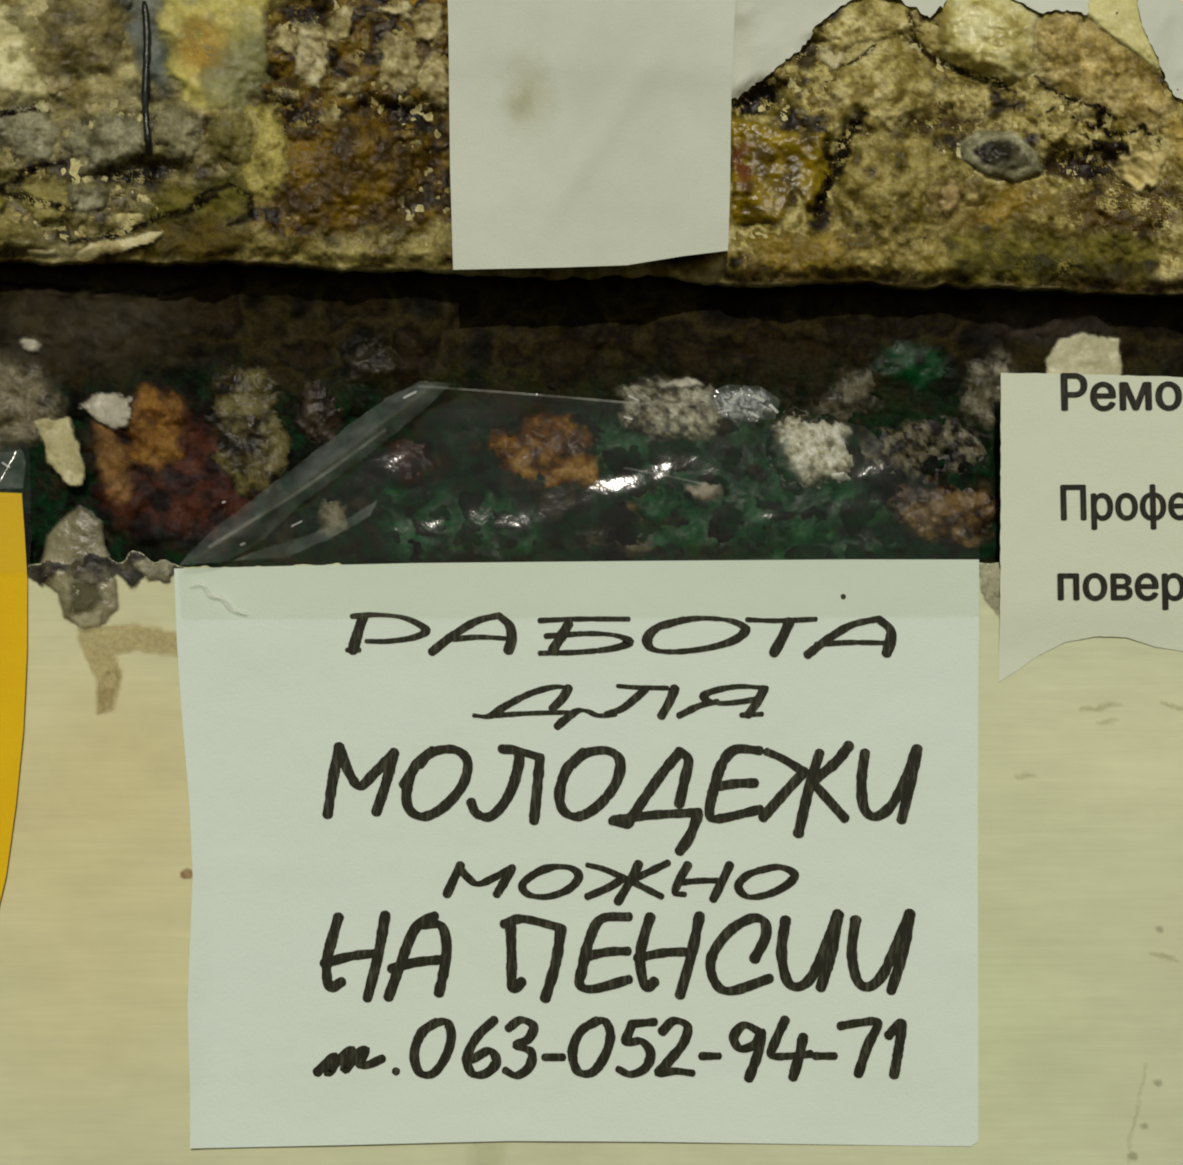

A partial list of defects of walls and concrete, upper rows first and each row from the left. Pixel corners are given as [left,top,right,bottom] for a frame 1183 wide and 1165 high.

water stain [126,0,171,87]
spalling [0,0,453,269]
spalling [723,0,1183,293]
water stain [144,213,251,261]
peeling [1046,333,1122,375]
peeling [34,417,85,485]
peeling [82,393,132,428]
spalling [203,369,344,495]
water stain [618,377,772,441]
spalling [769,355,1016,548]
water stain [688,482,719,500]
spalling [27,552,184,588]